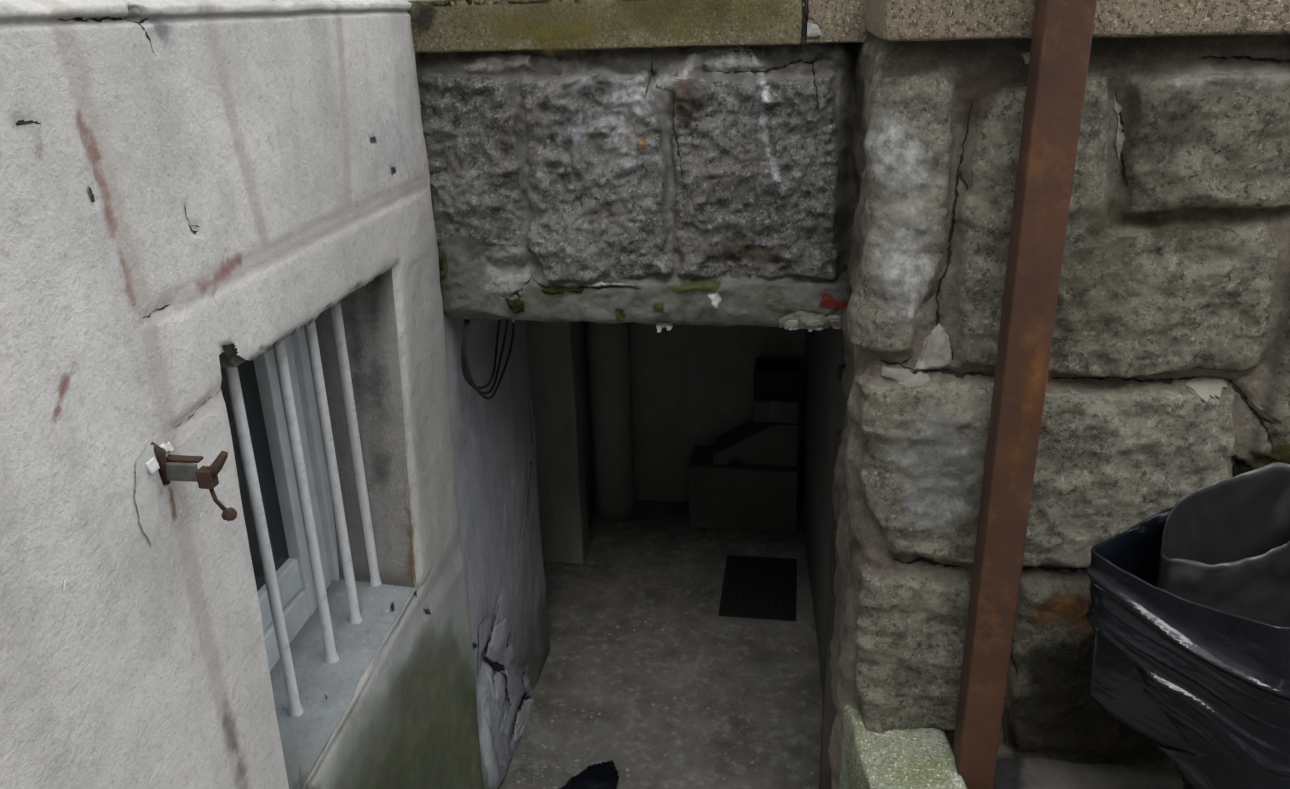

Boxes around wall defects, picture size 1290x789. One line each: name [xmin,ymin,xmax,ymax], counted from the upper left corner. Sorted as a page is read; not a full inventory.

spalling [122,6,140,20]
crack [706,0,829,110]
crack [1201,55,1290,63]
crack [645,57,683,175]
water stain [483,249,530,296]
crack [880,103,995,378]
peeling [473,613,534,769]